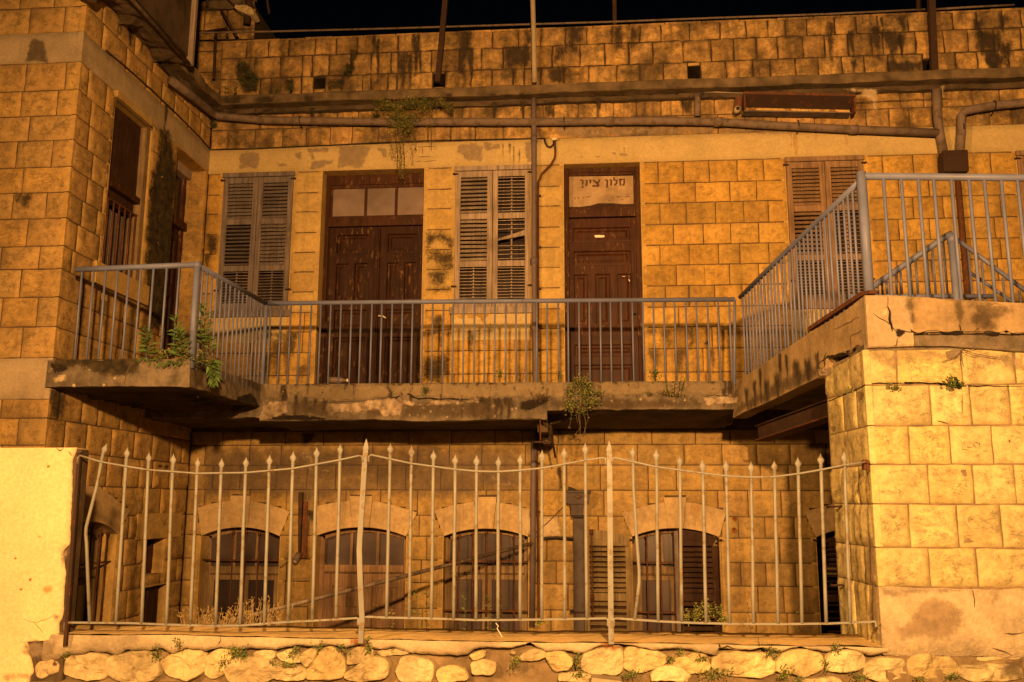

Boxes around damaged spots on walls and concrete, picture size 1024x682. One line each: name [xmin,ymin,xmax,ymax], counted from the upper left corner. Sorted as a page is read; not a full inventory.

damp [399,34,420,87]
damp [459,31,473,85]
damp [505,32,531,67]
damp [549,27,584,82]
damp [872,15,921,72]
damp [974,15,1011,68]
crack [821,304,1018,366]
peeling [237,382,565,420]
peeling [594,382,738,405]
damp [902,601,960,636]